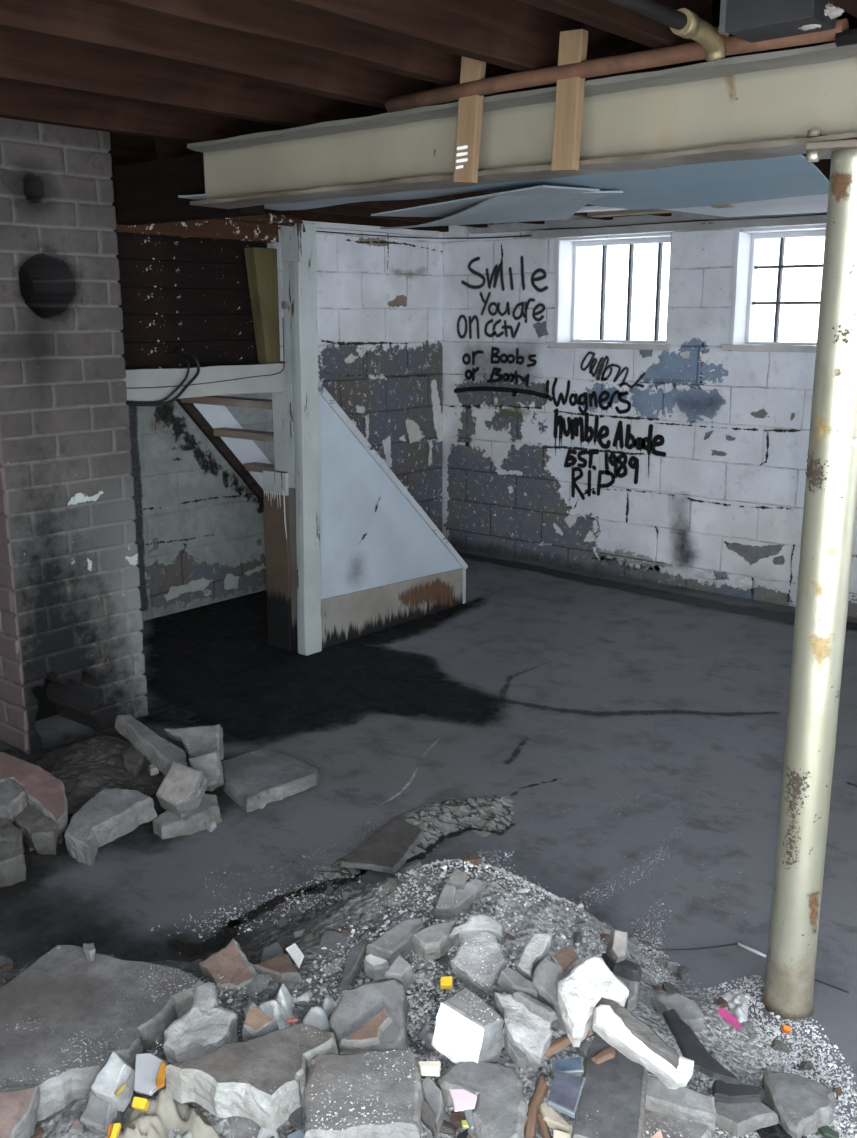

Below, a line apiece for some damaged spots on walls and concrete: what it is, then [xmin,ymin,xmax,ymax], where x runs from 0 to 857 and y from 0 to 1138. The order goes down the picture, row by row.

peeling [318,338,793,607]
peeling [68,491,103,505]
peeling [126,537,266,611]
corrosion [401,579,455,610]
crack [463,669,777,716]
crack [512,778,562,795]
corrosion [782,766,814,873]
crack [404,823,515,864]
crack [168,869,370,956]
corrosion [809,892,819,933]